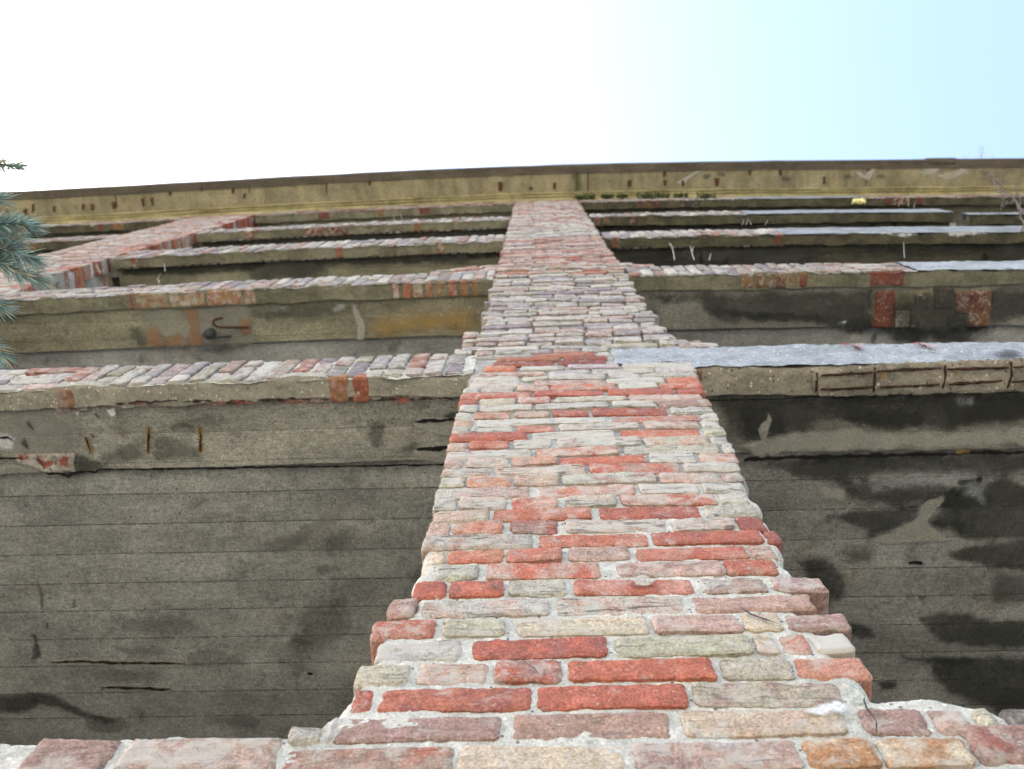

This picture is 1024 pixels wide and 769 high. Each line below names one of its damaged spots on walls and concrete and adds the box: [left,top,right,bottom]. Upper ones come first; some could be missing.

spalling [869,270,992,329]
spalling [812,350,1024,397]
spalling [0,422,75,473]
leakage [719,393,1024,599]
leakage [851,624,872,637]
leakage [908,613,1024,710]
leakage [0,693,113,723]